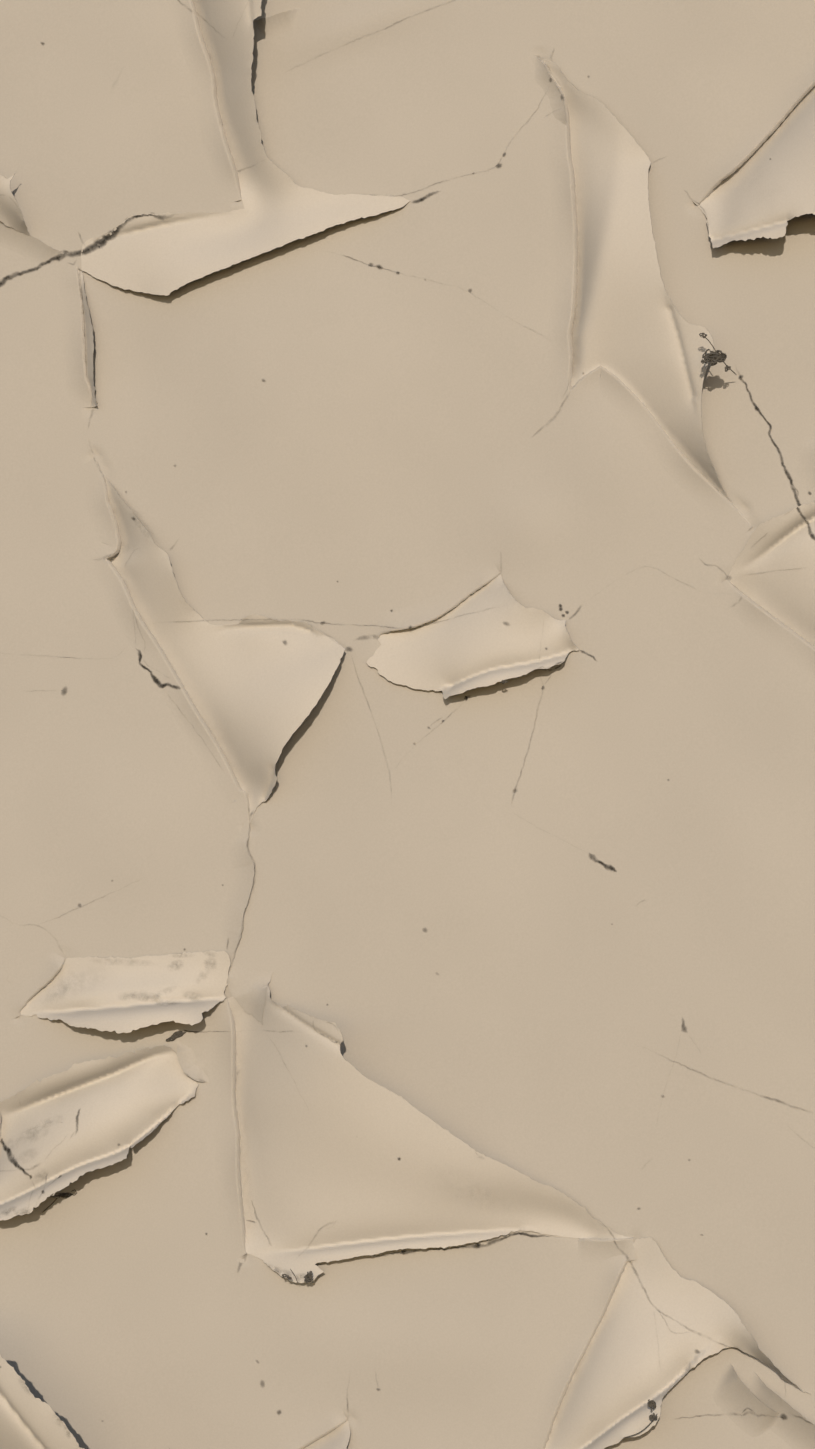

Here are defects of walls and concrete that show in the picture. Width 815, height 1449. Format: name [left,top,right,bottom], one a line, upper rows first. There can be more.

crack [0,214,161,286]
peeling [0,0,410,408]
peeling [76,458,345,825]
peeling [360,556,579,699]
peeling [525,52,815,678]
crack [739,376,811,534]
peeling [0,949,815,1449]